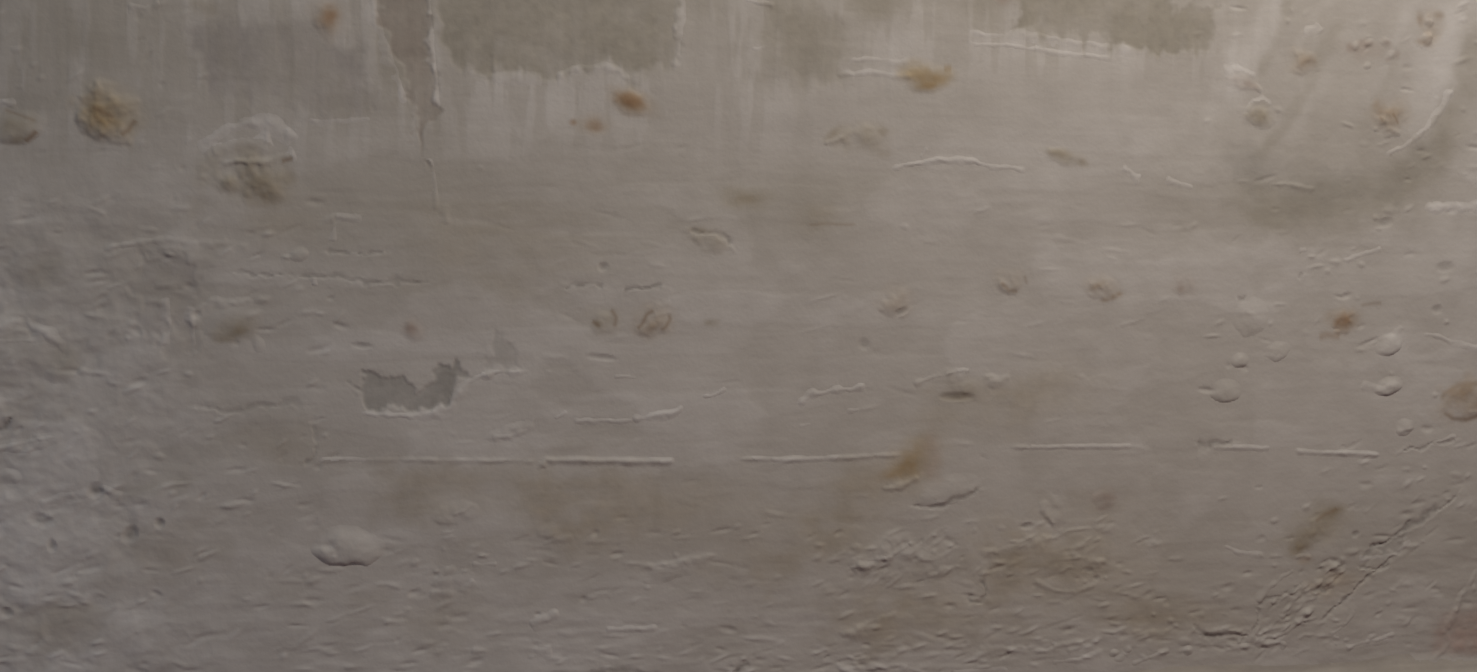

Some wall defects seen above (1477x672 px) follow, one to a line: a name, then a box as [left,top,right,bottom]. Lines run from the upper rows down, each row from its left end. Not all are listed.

corrosion [0,69,155,154]
corrosion [600,81,668,123]
corrosion [892,54,961,98]
corrosion [1318,298,1383,345]
crack [0,417,13,437]
peeling [342,341,530,422]
corrosion [1422,366,1477,432]
crack [1193,494,1459,644]